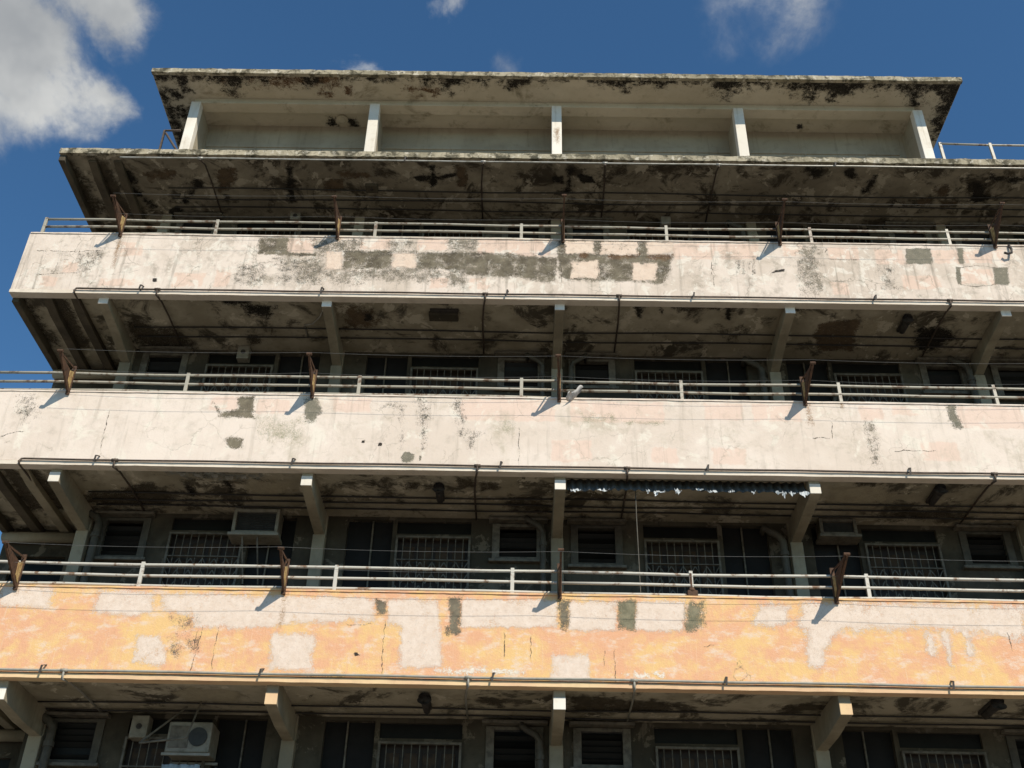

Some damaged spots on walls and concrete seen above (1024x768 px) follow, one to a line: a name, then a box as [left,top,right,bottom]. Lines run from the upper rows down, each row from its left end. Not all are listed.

damp [153,75,570,146]
damp [586,80,960,148]
damp [68,158,205,215]
damp [805,167,825,180]
damp [842,167,879,195]
damp [967,174,1024,205]
damp [794,244,827,298]
damp [214,395,323,446]
damp [445,596,463,636]
damp [616,598,639,632]
damp [682,598,707,633]
peeling [794,600,1024,673]